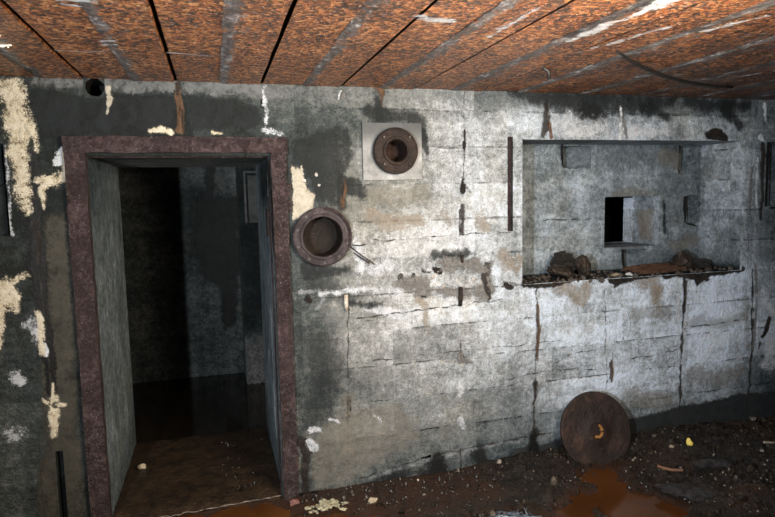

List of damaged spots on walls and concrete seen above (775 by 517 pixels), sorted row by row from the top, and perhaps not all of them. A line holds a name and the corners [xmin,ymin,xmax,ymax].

corrosion [174,82,185,134]
damp [364,97,429,155]
damp [294,128,367,211]
damp [301,240,394,279]
damp [0,77,291,517]
damp [319,287,434,321]
crack [631,265,758,424]
crack [330,289,608,486]
damp [306,427,321,451]
damp [377,452,447,482]
damp [470,446,487,463]